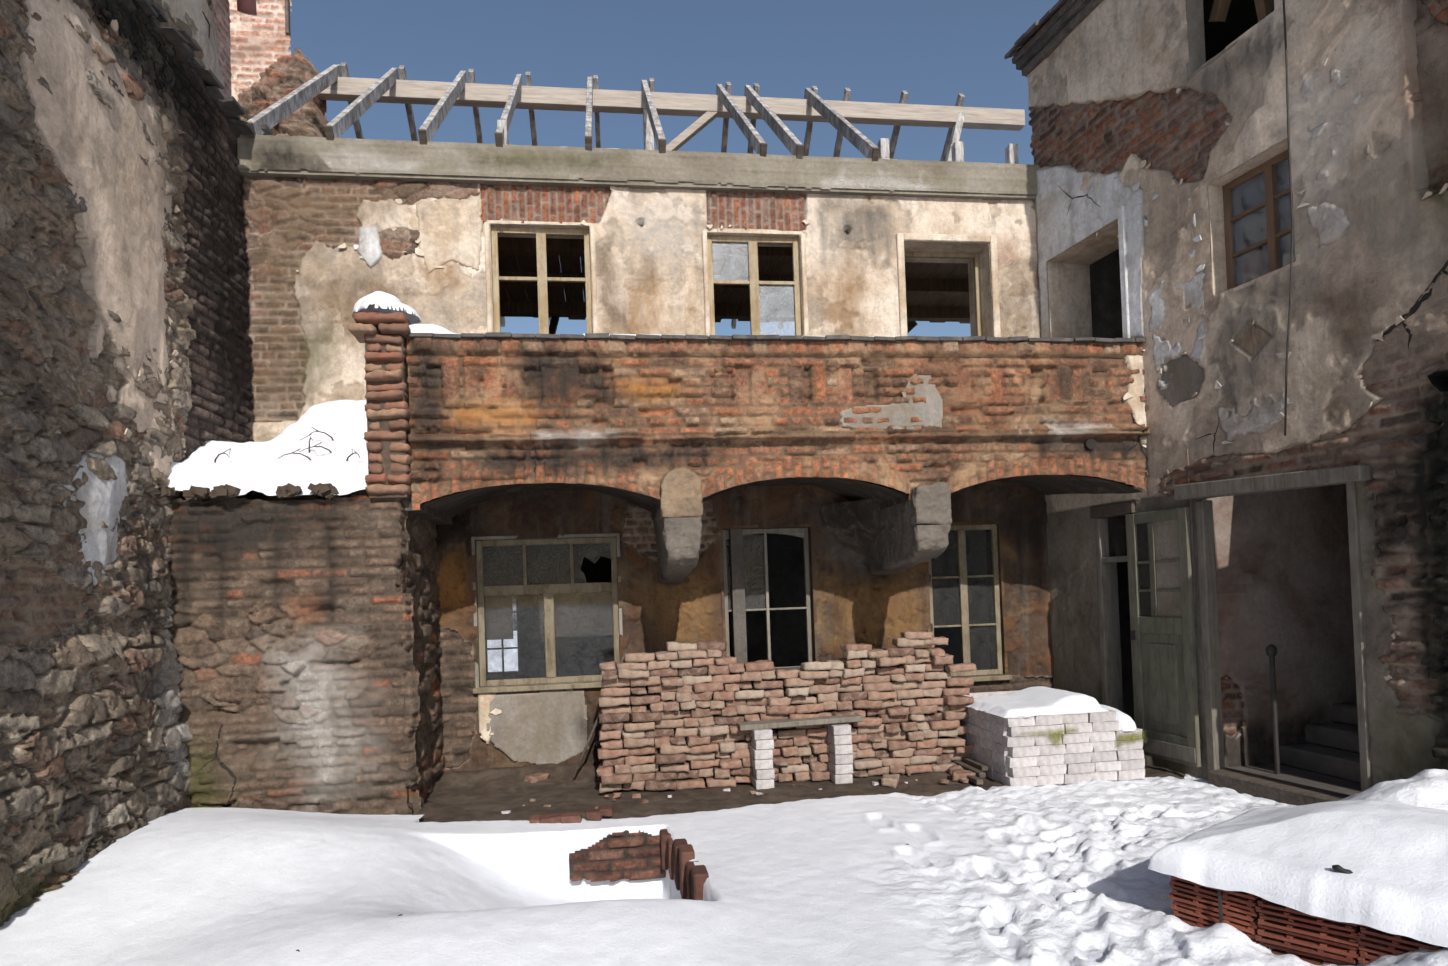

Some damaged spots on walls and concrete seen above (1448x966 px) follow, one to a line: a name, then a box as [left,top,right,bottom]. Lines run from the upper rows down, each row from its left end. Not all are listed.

flaking render [19,0,180,491]
flaking render [241,175,616,422]
flaking render [1028,88,1232,448]
peeling [1296,149,1349,249]
crack [1377,260,1448,349]
flaking render [53,453,129,594]
flaking render [1154,266,1448,757]
damp [1375,393,1448,770]